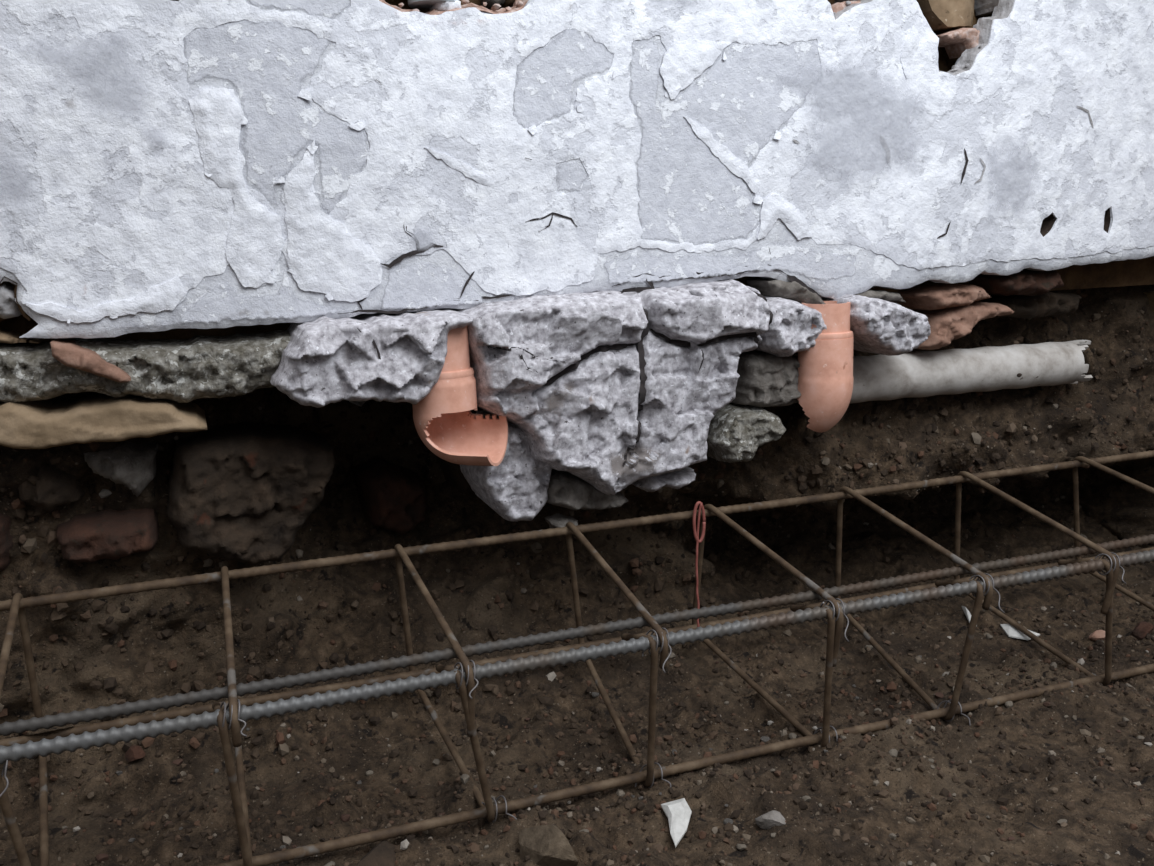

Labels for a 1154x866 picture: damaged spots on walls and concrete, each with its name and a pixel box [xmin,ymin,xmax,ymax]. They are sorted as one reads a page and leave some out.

spalling [379,0,528,15]
spalling [833,0,873,20]
spalling [939,0,1014,75]
peeling [0,0,492,327]
crack [527,212,578,232]
crack [380,226,443,268]